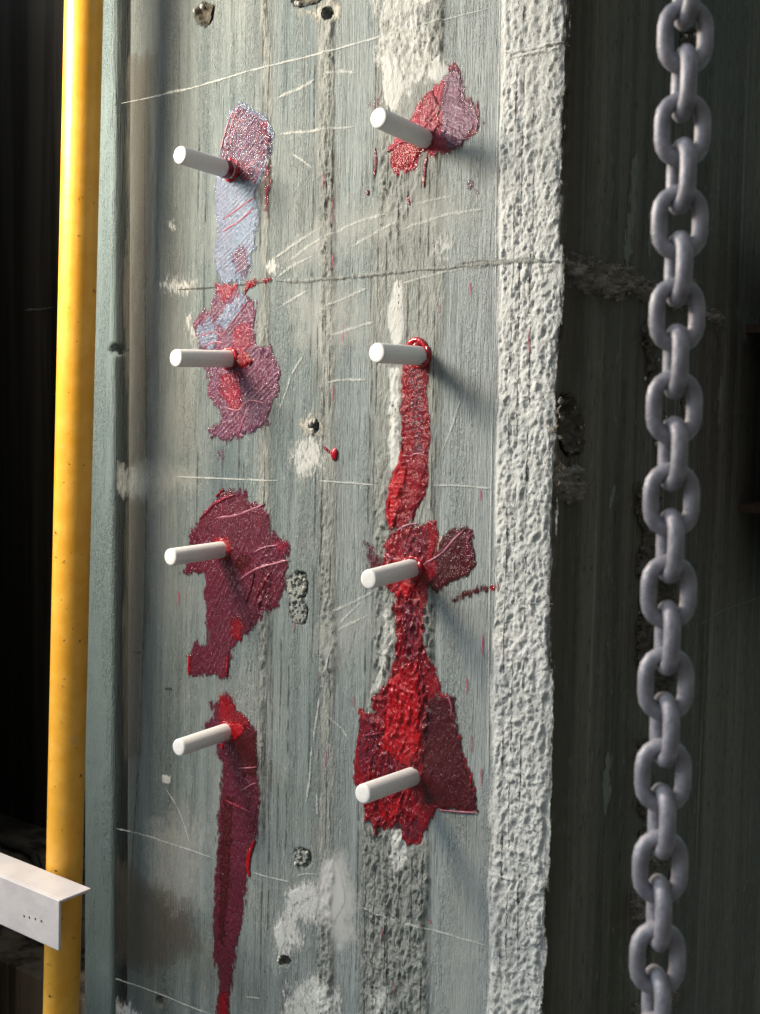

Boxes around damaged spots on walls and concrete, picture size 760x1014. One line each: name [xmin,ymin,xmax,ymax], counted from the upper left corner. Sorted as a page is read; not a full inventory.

spalling [549,392,592,505]
spalling [634,482,656,579]
spalling [287,573,308,624]
spalling [657,577,679,607]
spalling [635,596,655,668]
spalling [654,668,676,697]
spalling [637,802,648,841]
water stain [272,860,352,967]
spalling [630,891,646,932]
water stain [281,975,342,1014]